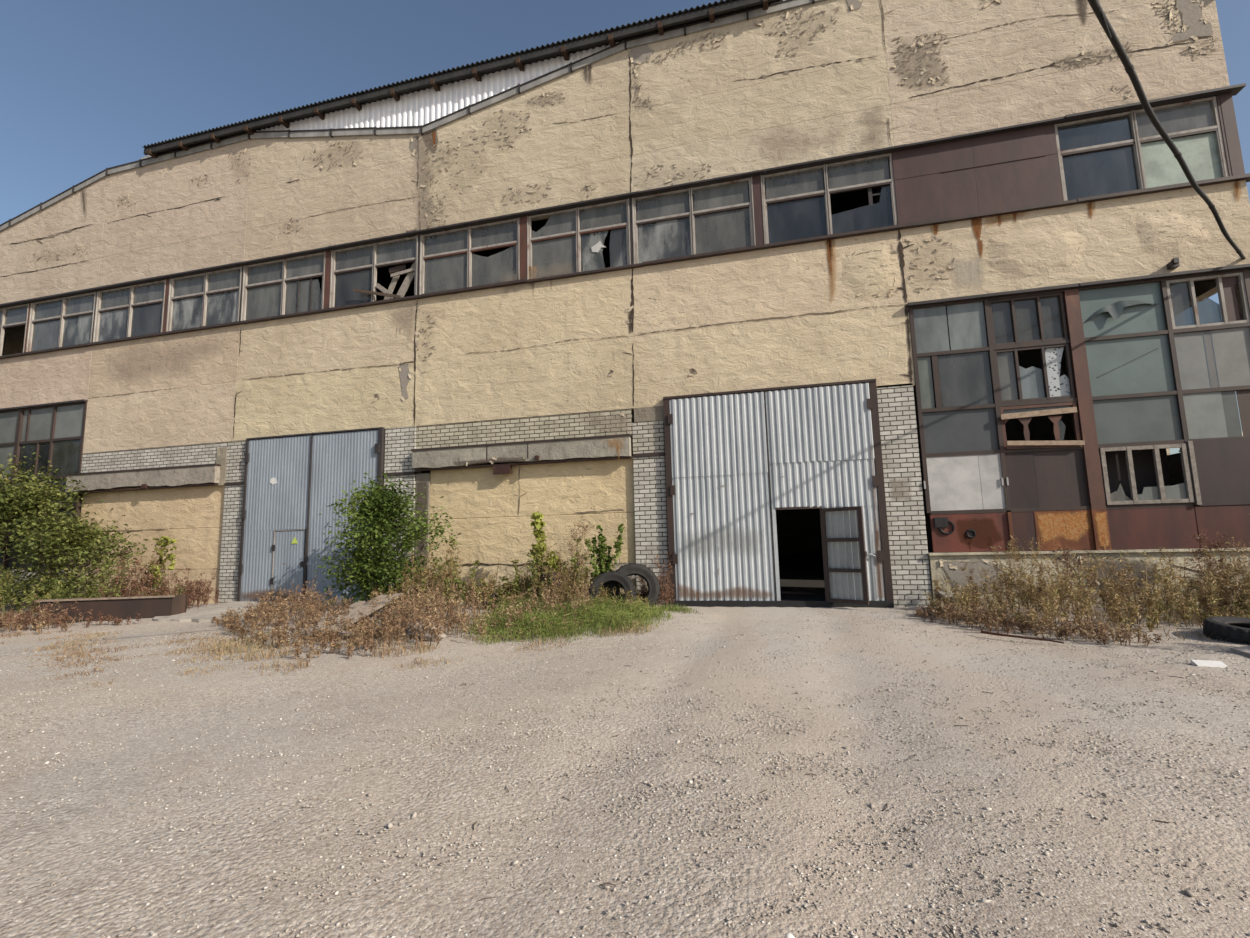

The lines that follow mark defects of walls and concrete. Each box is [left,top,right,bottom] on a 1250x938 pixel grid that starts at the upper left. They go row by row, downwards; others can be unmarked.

spalling [630,31,730,109]
peeling [754,0,863,57]
peeling [891,29,950,89]
crack [737,0,1112,81]
crack [878,36,1220,146]
spalling [1152,0,1219,60]
peeling [891,236,955,293]
rust [971,218,983,257]
rust [958,519,1002,550]
rust [1037,511,1109,549]